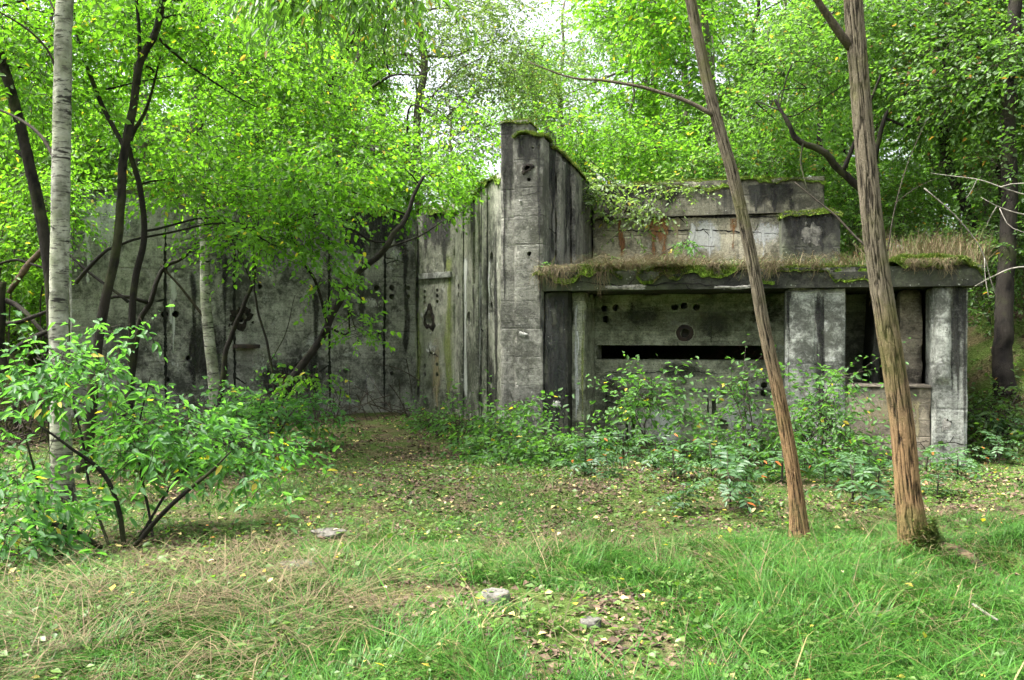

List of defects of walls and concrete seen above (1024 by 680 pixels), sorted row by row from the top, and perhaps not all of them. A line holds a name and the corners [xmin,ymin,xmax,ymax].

corrosion [649,218,681,256]
damp [748,184,833,256]
spalling [801,222,824,246]
damp [463,123,583,431]